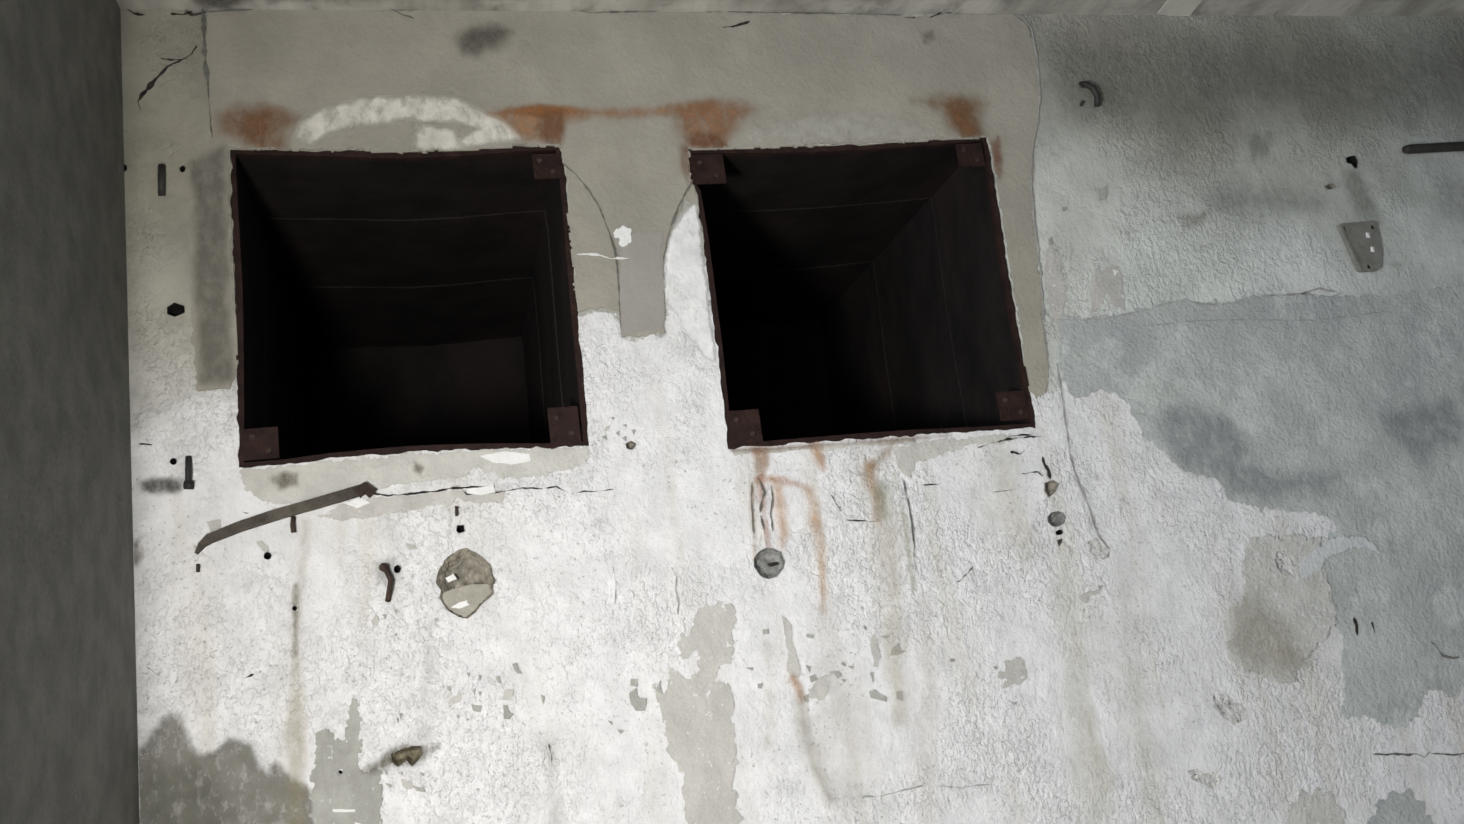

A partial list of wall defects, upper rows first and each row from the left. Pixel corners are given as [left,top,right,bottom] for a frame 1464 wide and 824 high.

crack [579,7,656,15]
crack [707,11,958,28]
crack [127,9,252,137]
corrosion [500,106,584,142]
corrosion [606,103,747,147]
corrosion [931,99,978,135]
corrosion [754,449,772,479]
peeling [1056,264,1464,729]
peeling [763,616,853,702]
peeling [629,601,763,824]
damp [138,716,314,824]
peeling [1367,788,1432,824]